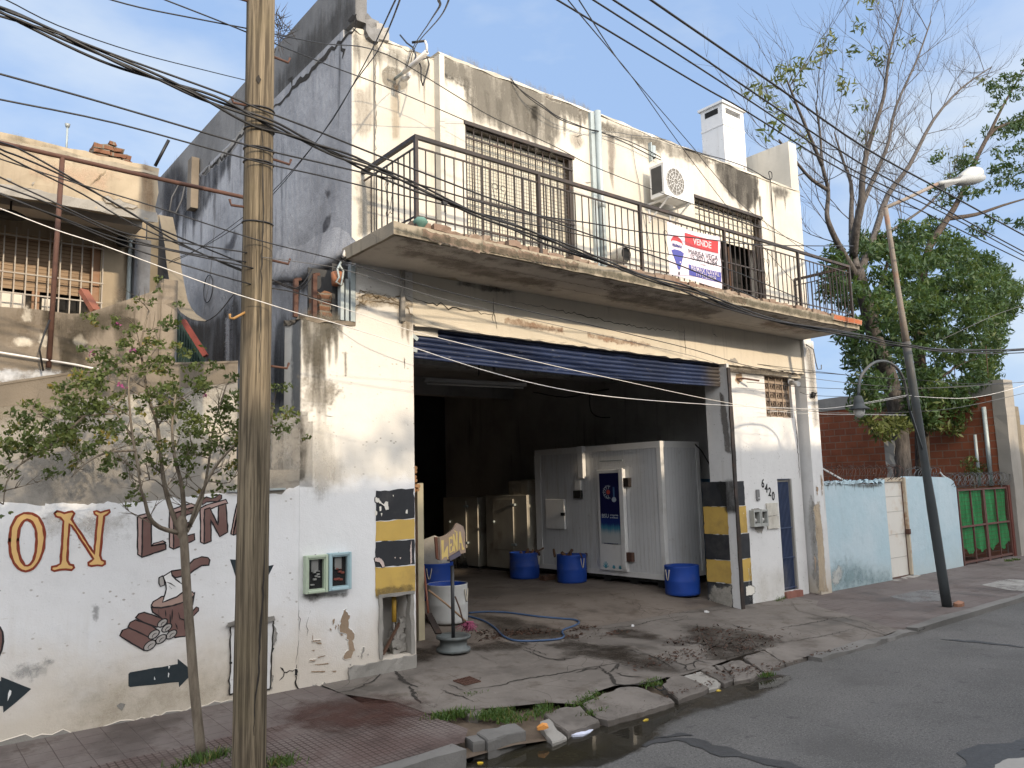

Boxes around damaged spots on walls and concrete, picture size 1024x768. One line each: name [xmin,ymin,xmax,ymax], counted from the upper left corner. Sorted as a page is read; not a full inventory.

damp [374,45,427,87]
damp [444,58,590,160]
damp [601,123,763,220]
damp [274,313,346,426]
peeling [374,495,394,516]
peeling [374,542,412,568]
peeling [330,608,369,666]